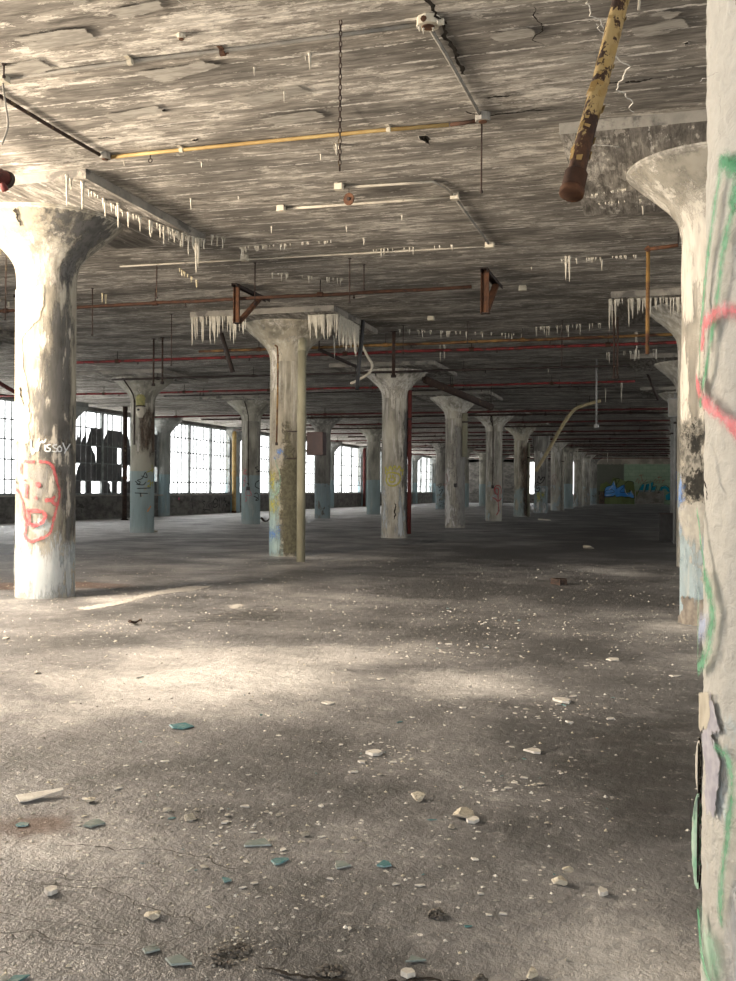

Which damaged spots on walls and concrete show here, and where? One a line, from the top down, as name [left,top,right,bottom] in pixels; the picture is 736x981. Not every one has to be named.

crack [424,0,465,75]
crack [532,7,544,46]
crack [586,1,652,112]
crack [466,95,557,116]
peeling [679,500,705,583]
peeling [678,595,704,627]
crack [65,844,237,869]
crack [0,867,204,956]
crack [257,965,350,981]
crack [388,973,461,981]